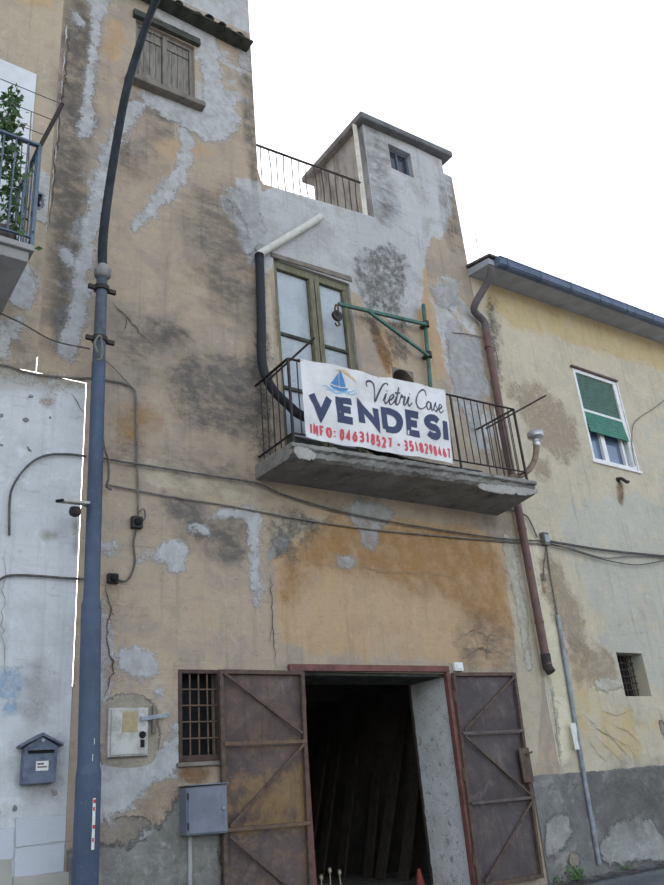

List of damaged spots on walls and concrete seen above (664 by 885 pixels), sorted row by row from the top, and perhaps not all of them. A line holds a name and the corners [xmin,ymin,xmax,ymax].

crack [46,25,70,233]
peeling [131,127,196,232]
damp [356,243,406,357]
damp [176,358,274,460]
crack [268,573,276,660]
spalling [100,815,151,850]
peeling [545,814,580,868]